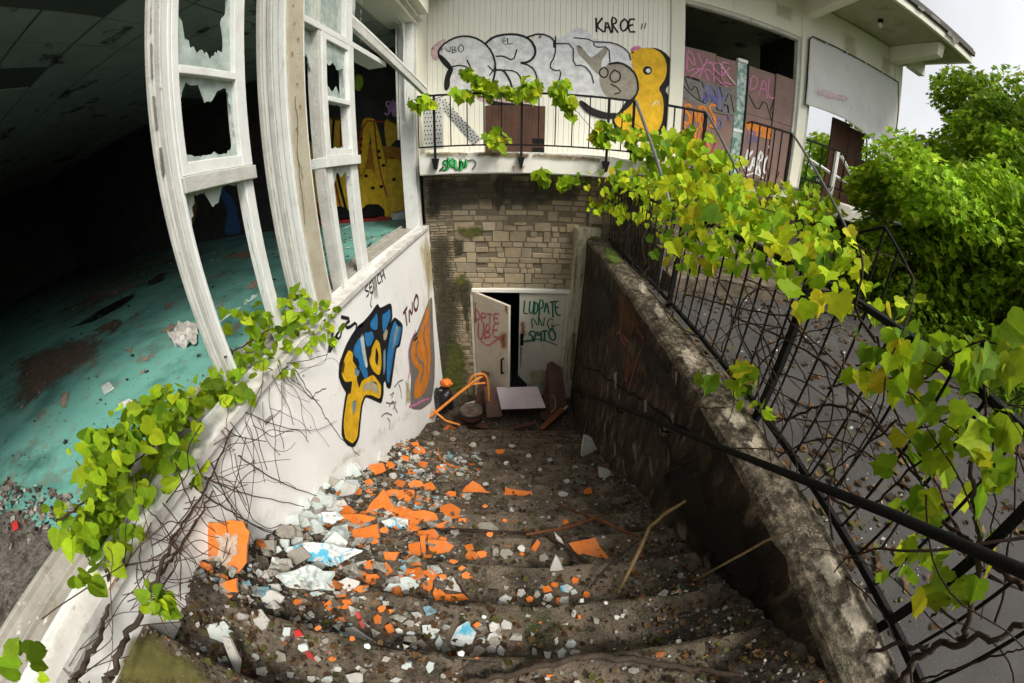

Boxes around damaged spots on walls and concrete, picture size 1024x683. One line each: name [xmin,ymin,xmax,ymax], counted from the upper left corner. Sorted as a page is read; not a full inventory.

leakage [423,237,470,379]
leakage [650,448,772,620]